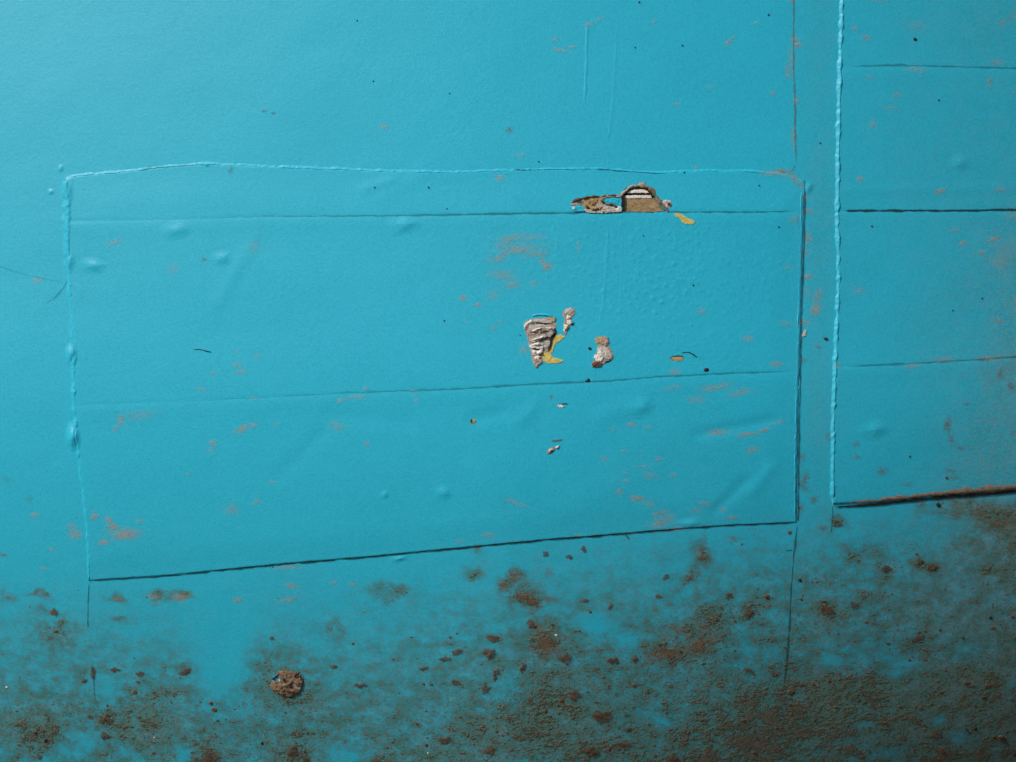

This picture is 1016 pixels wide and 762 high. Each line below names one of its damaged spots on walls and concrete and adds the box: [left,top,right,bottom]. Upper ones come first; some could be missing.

peeling [570,182,695,224]
peeling [524,307,575,367]
peeling [591,336,613,367]
rust [270,670,304,698]